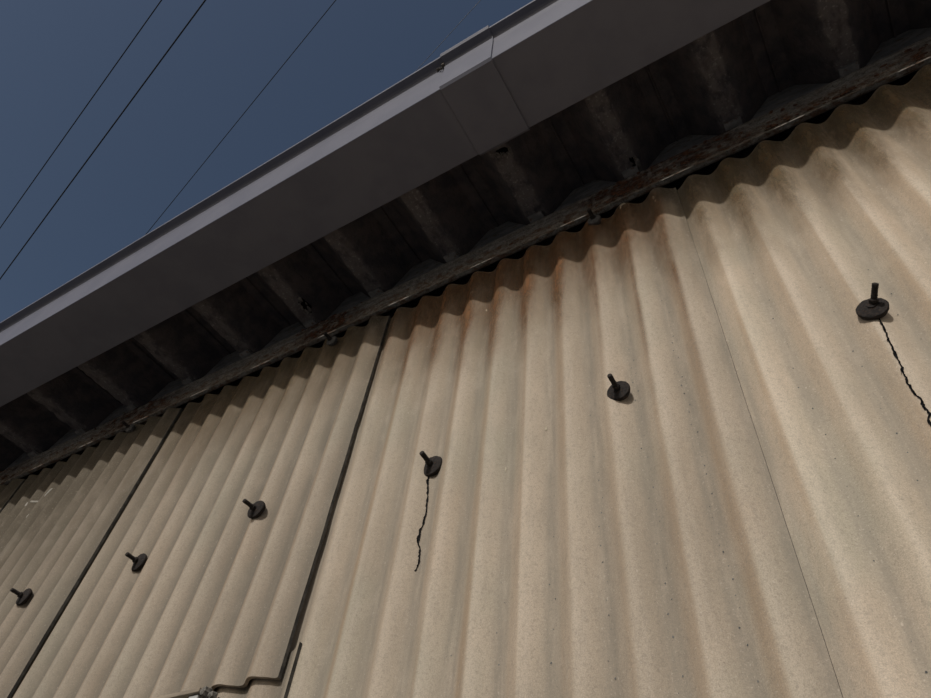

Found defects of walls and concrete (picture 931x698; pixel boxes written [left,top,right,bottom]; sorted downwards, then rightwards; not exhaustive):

corrosion [412,131,751,347]
crack [879,318,931,426]
crack [414,476,429,571]